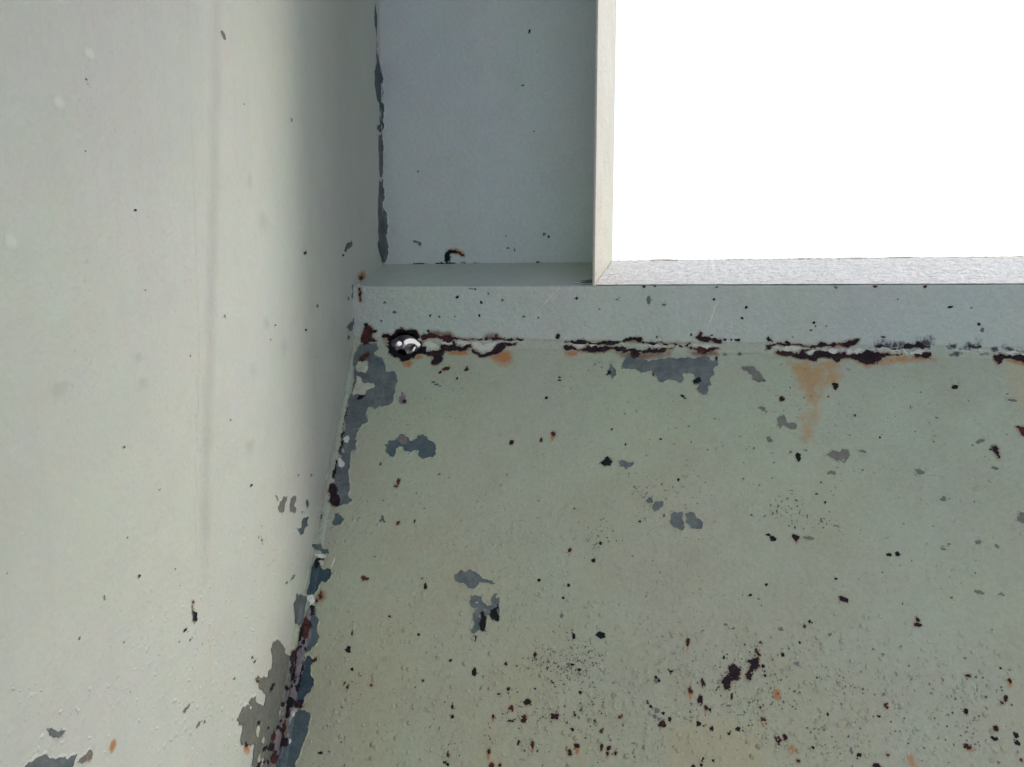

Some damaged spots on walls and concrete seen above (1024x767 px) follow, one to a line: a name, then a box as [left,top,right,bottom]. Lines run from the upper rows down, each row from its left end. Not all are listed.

corrosion [444,246,468,262]
corrosion [359,314,527,379]
corrosion [555,328,740,362]
peeling [605,352,767,396]
corrosion [763,321,1024,462]
peeling [383,433,438,460]
peeling [646,497,704,532]
peeling [236,317,408,767]
peeling [453,568,502,641]
corrosion [646,664,815,767]
peeling [23,726,94,767]